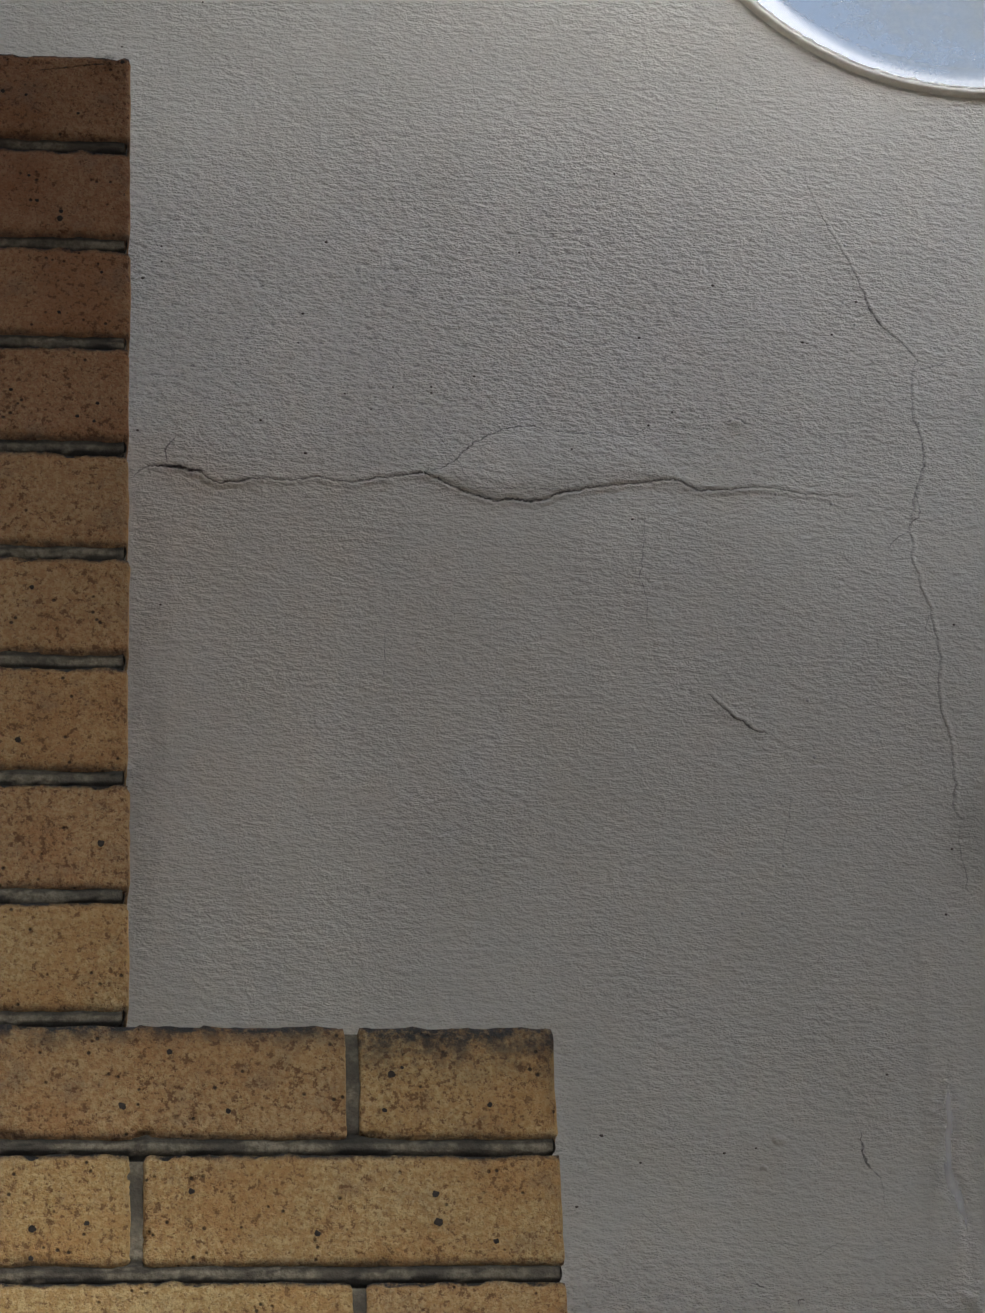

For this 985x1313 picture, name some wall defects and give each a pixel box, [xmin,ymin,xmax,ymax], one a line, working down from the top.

crack [128,425,861,509]
crack [708,691,770,734]